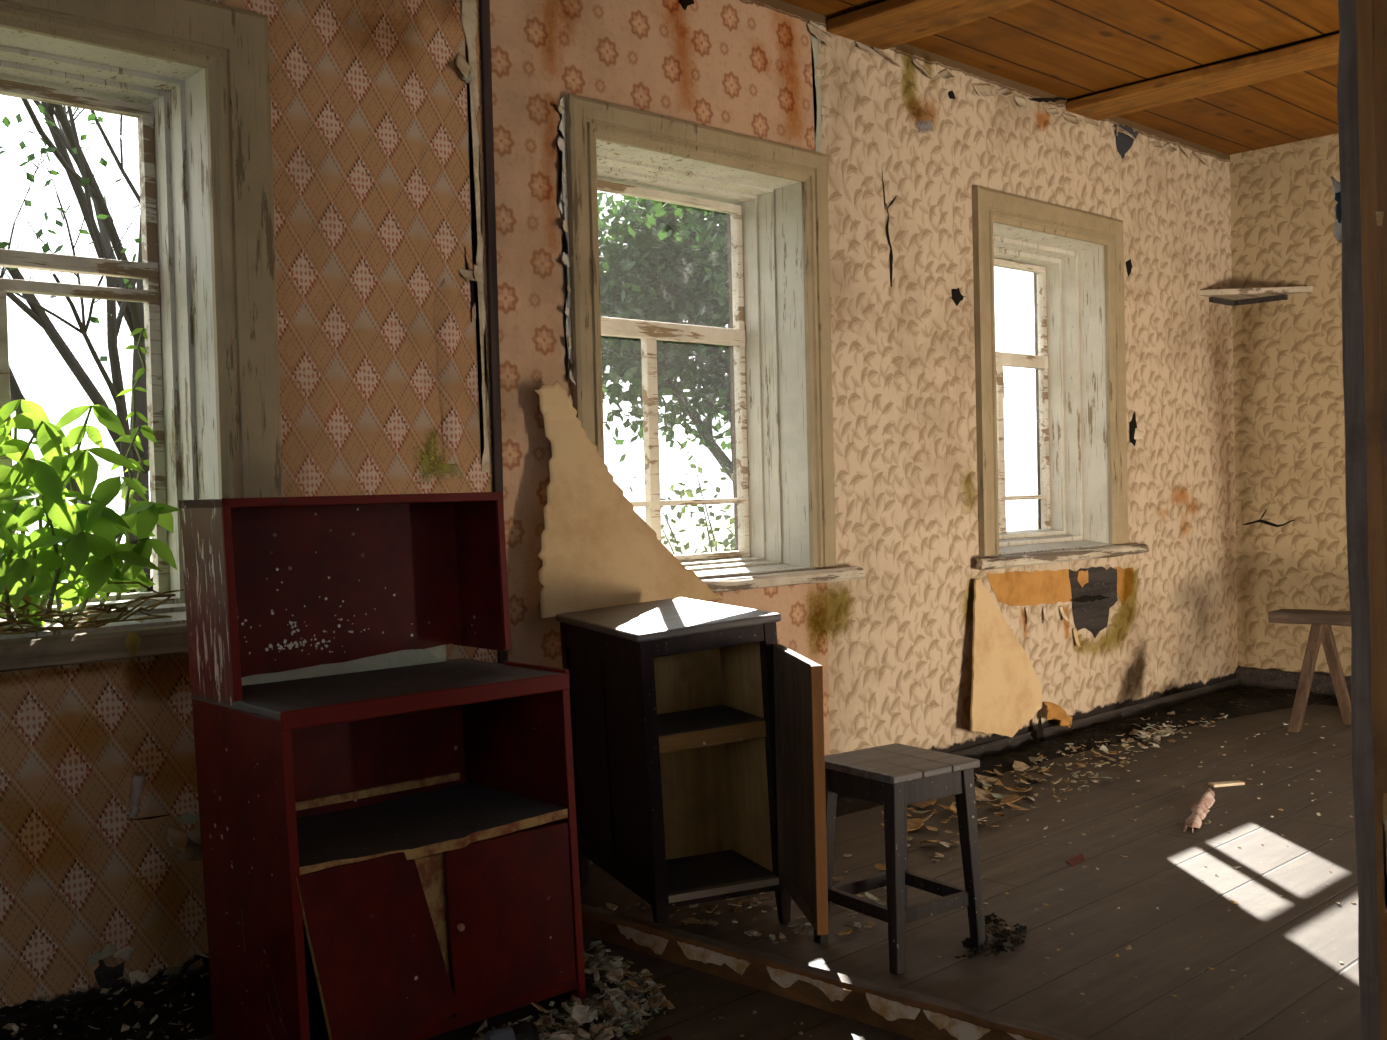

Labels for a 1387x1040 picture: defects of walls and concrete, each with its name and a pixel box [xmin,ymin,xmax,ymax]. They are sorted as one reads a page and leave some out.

crack [882,171,897,287]
spalling [986,566,1134,647]